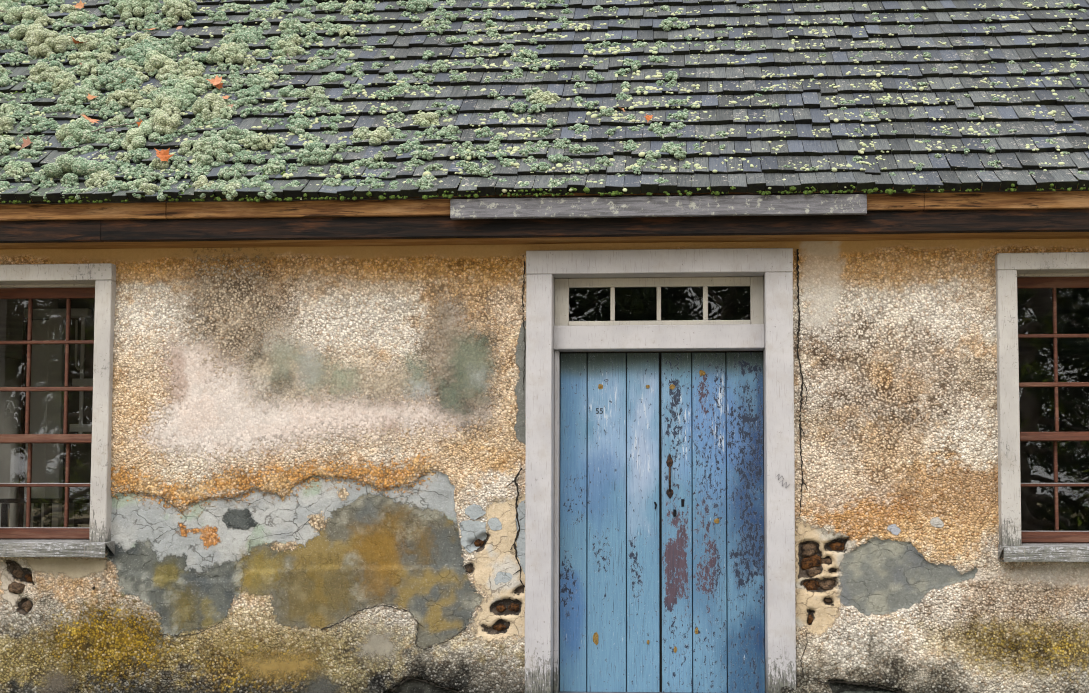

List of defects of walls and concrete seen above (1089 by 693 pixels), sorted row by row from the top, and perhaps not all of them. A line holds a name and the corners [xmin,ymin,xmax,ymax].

damp [174,247,290,379]
crack [796,249,808,516]
damp [192,637,330,693]
spalling [0,470,525,644]
damp [41,493,485,683]
spalling [795,519,856,636]
damp [960,617,1089,682]